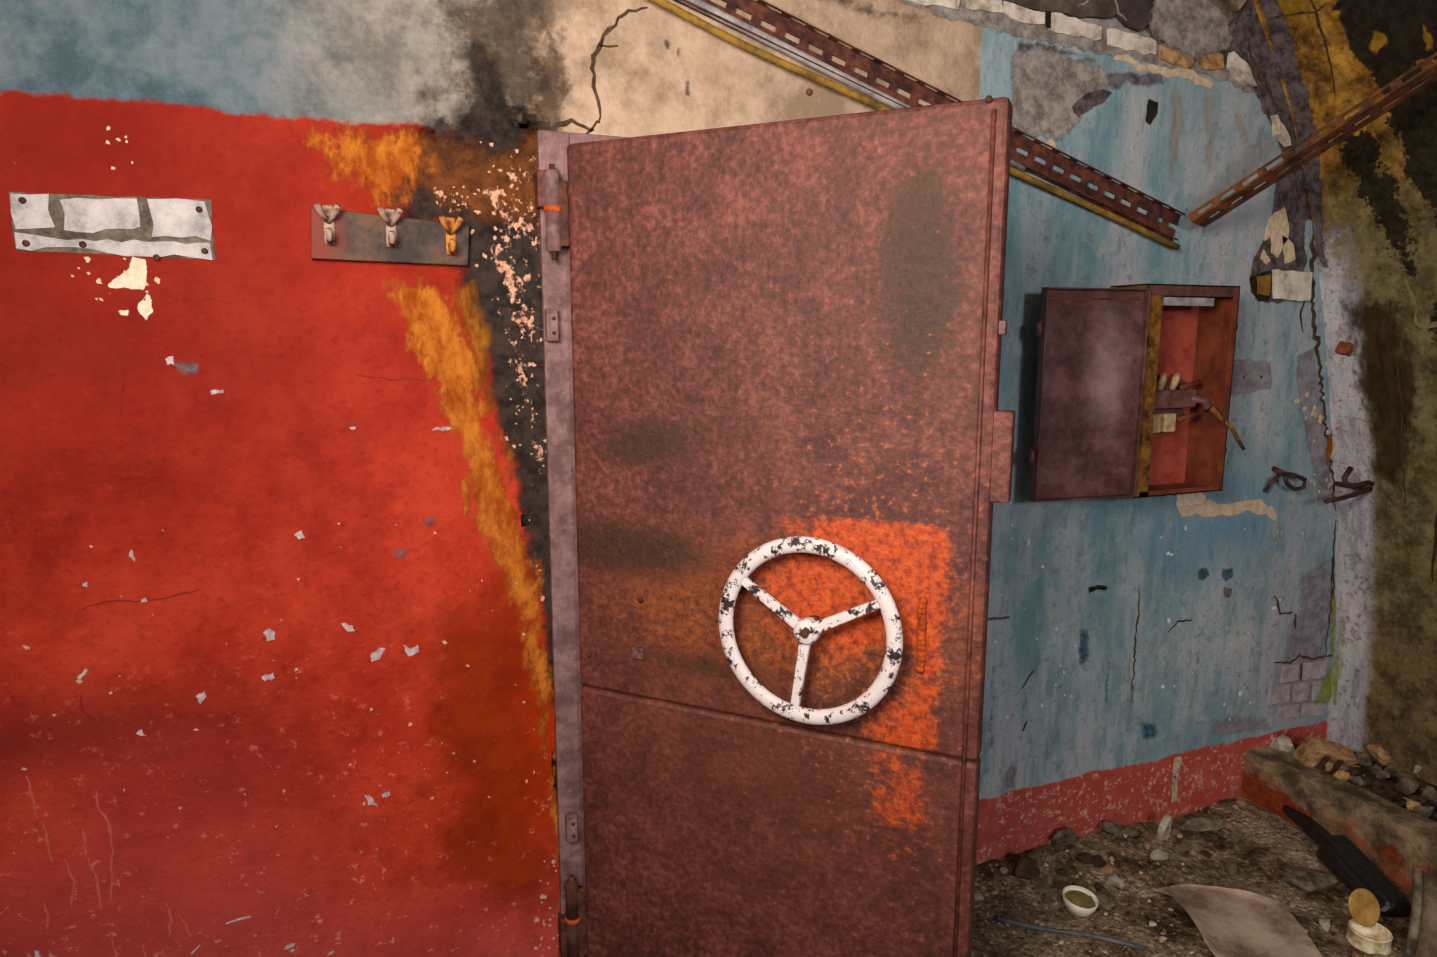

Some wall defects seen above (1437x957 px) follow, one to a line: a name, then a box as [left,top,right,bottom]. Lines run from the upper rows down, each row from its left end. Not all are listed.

flaking render [9,192,216,320]
rust [308,126,540,231]
crack [551,7,648,134]
crack [1078,0,1127,21]
peeling [899,0,1329,304]
damp [1345,301,1416,489]
rust [384,278,559,950]
flaking render [979,335,1335,876]